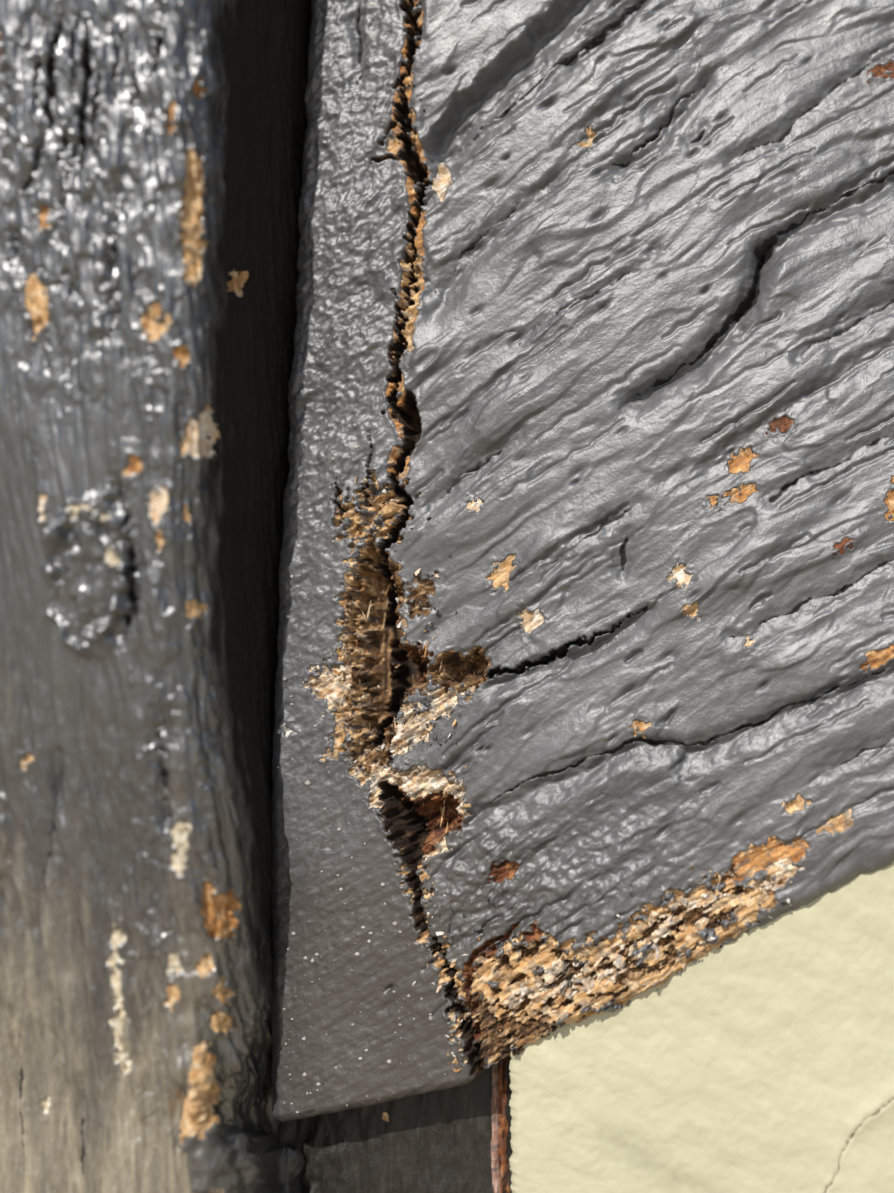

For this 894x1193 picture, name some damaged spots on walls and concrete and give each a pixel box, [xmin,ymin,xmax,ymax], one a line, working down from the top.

peeling [178,149,208,291]
peeling [466,496,484,512]
crack [299,0,894,1078]
peeling [199,882,243,941]
peeling [432,809,857,1066]
peeling [164,952,236,1145]
crack [824,1098,894,1193]